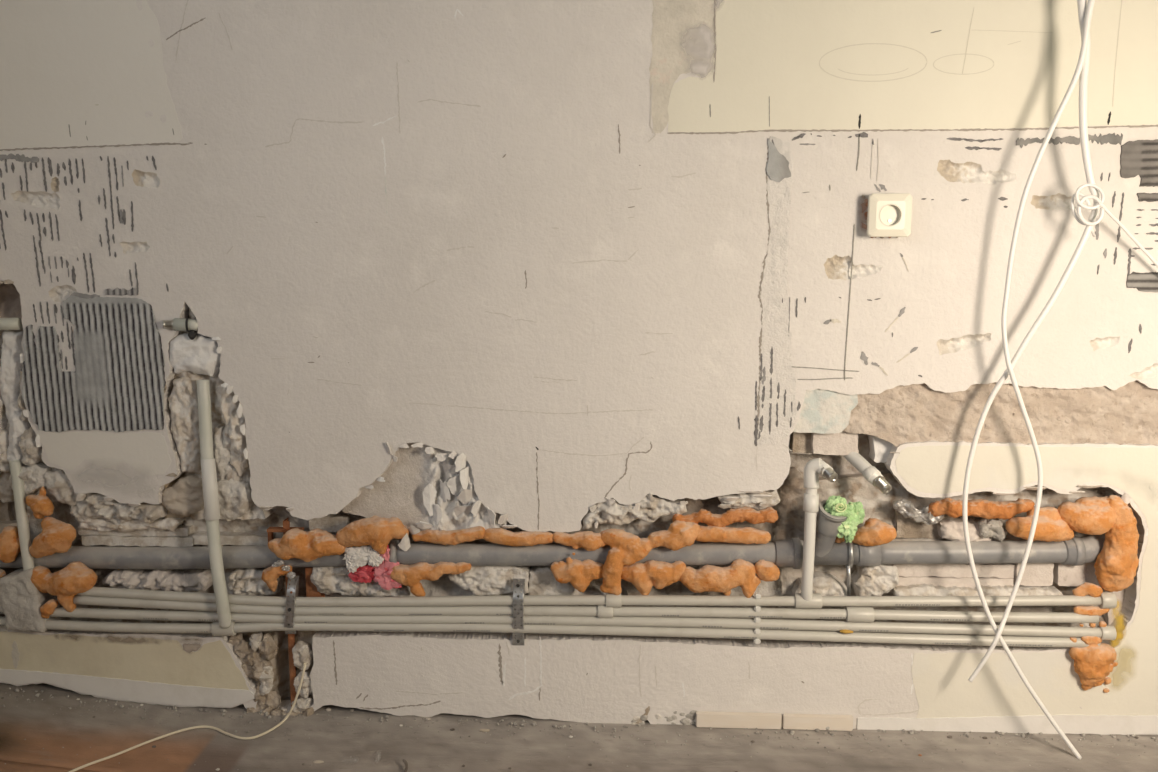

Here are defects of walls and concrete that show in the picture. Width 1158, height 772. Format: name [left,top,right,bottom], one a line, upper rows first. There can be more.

flaking render [132,169,161,189]
flaking render [0,279,529,547]
crack [412,376,653,530]
peeling [547,0,1158,718]
peeling [0,565,318,717]
flaking render [92,566,606,606]